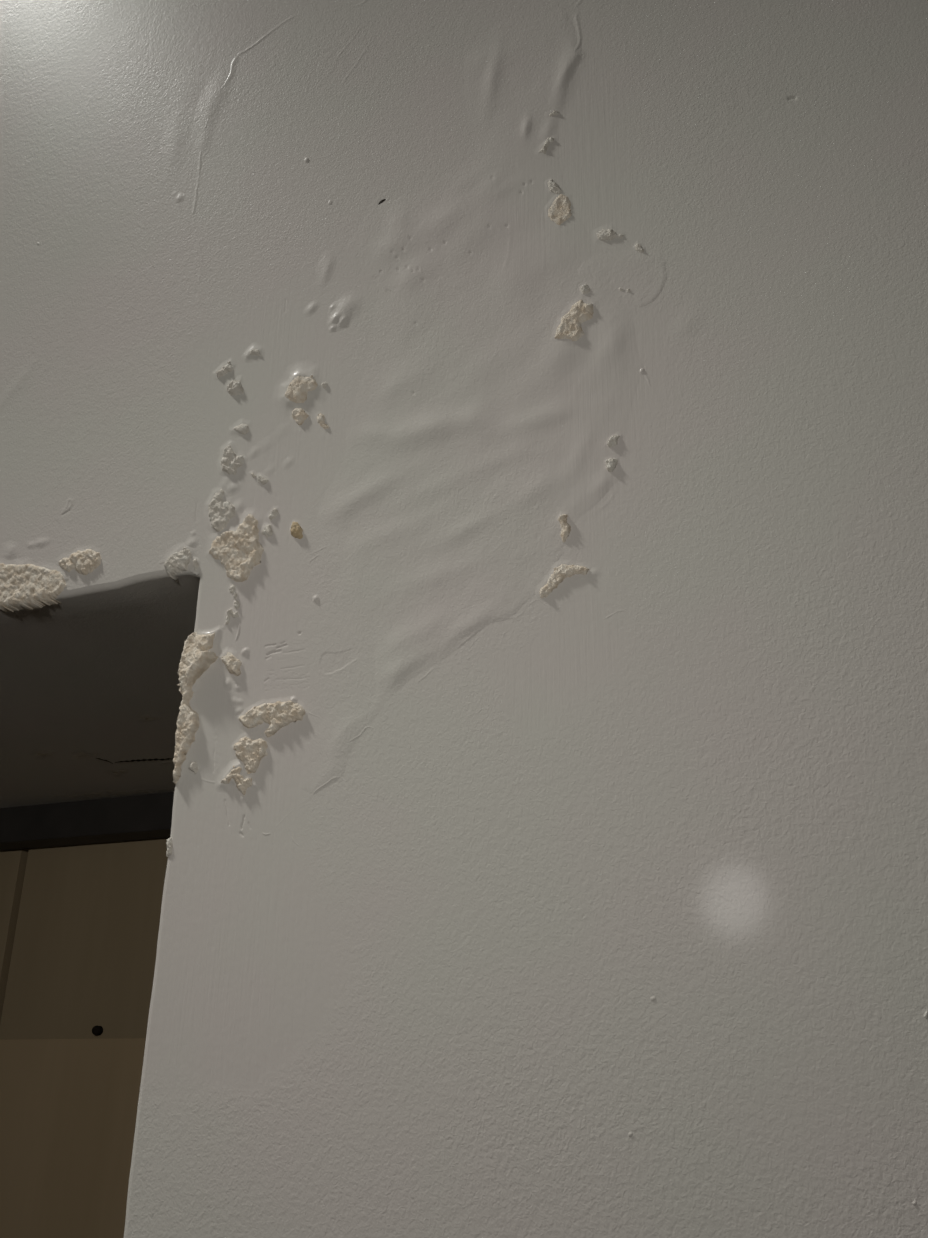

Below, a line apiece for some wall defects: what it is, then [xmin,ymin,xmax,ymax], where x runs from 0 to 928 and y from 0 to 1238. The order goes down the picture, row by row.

flaking render [550,282,599,347]
flaking render [212,342,266,400]
flaking render [272,360,331,433]
flaking render [0,544,104,612]
flaking render [158,439,304,785]
flaking render [535,558,603,601]
flaking render [214,696,309,804]